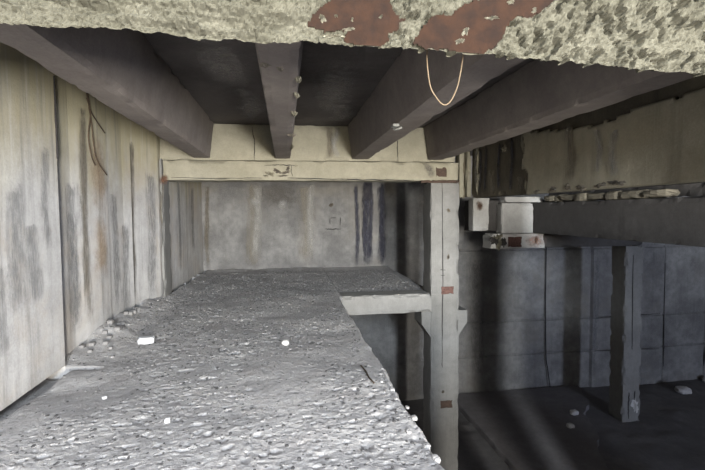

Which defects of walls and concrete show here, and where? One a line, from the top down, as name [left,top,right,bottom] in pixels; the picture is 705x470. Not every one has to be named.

corrosion [308,0,405,46]
corrosion [413,0,554,54]
water stain [68,109,89,317]
water stain [113,146,136,295]
water stain [354,182,386,261]